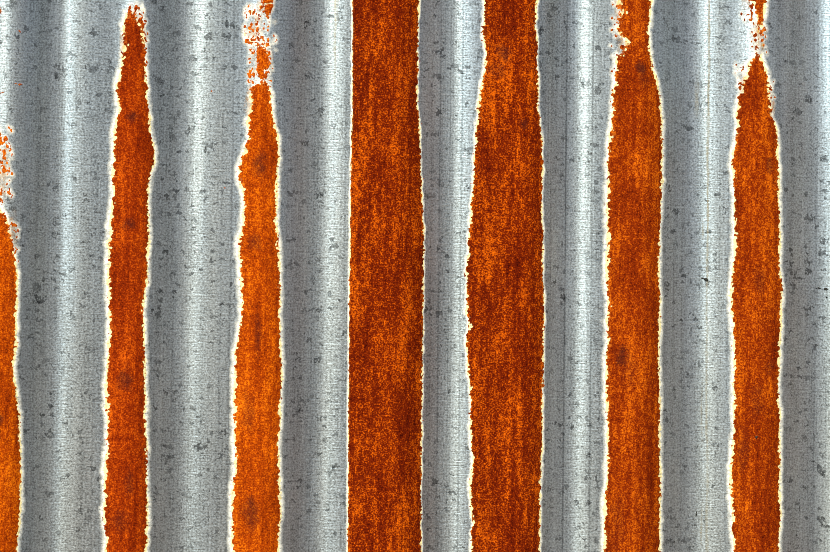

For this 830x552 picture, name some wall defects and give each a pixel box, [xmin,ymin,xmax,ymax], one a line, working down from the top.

corrosion [0,126,24,552]
corrosion [100,4,157,552]
corrosion [229,0,284,552]
corrosion [346,0,426,552]
corrosion [463,0,546,552]
corrosion [601,0,665,552]
corrosion [727,0,785,552]